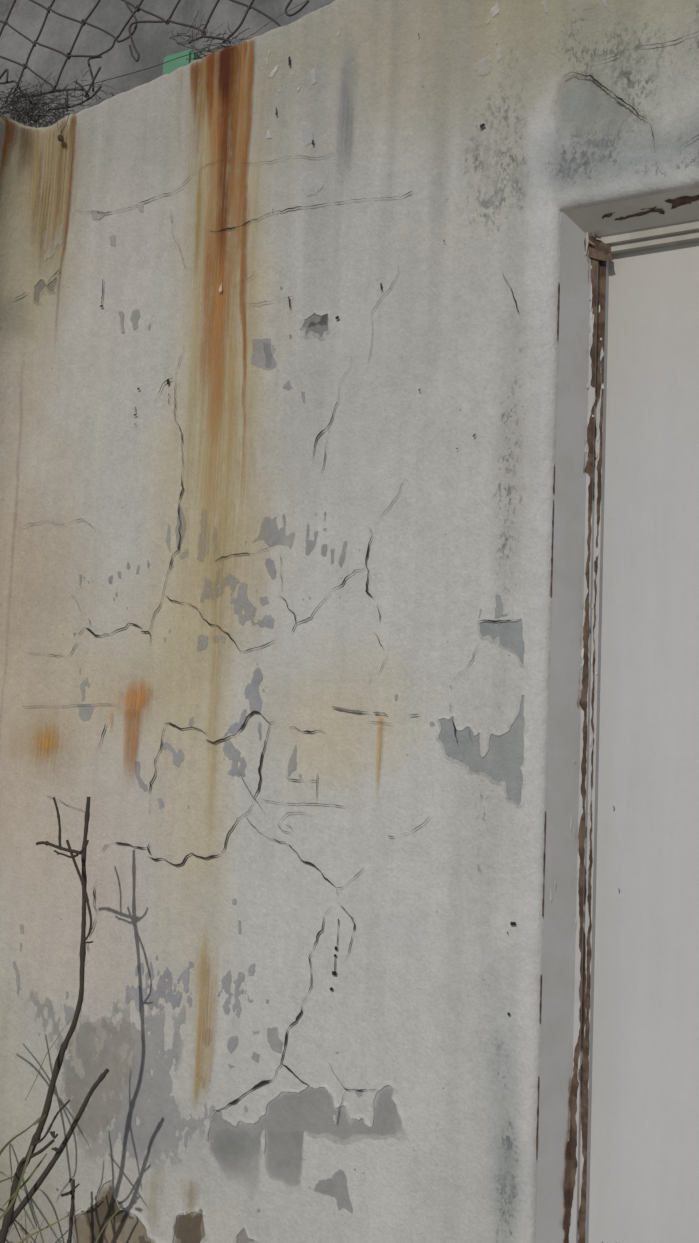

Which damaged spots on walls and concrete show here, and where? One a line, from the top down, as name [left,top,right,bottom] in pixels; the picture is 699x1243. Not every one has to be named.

rust [191,41,253,562]
crack [313,263,399,479]
rust [602,195,699,220]
crack [25,347,405,684]
peeling [245,511,345,579]
peeling [477,595,528,669]
peeling [430,691,530,809]
rust [563,231,613,1243]
crack [102,711,375,1124]
rust [542,812,556,916]
peeling [108,956,410,1159]
spalling [60,1176,210,1243]